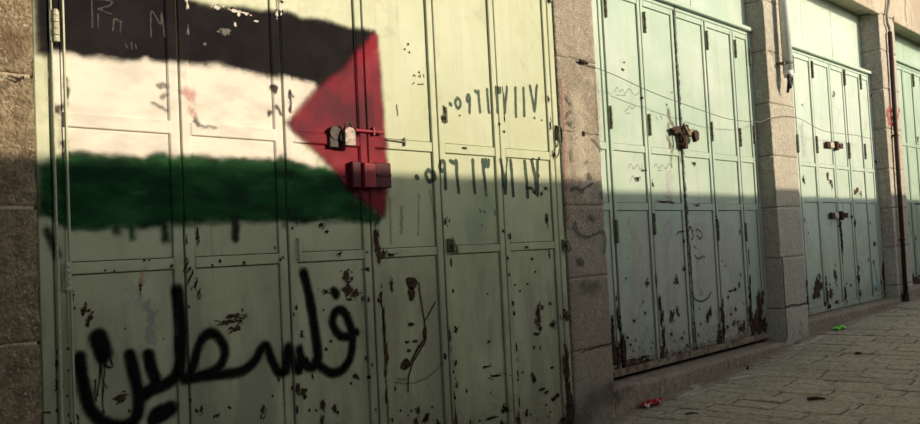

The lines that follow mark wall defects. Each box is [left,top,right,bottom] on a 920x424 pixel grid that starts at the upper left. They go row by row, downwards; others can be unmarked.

corrosion [401,277,435,392]